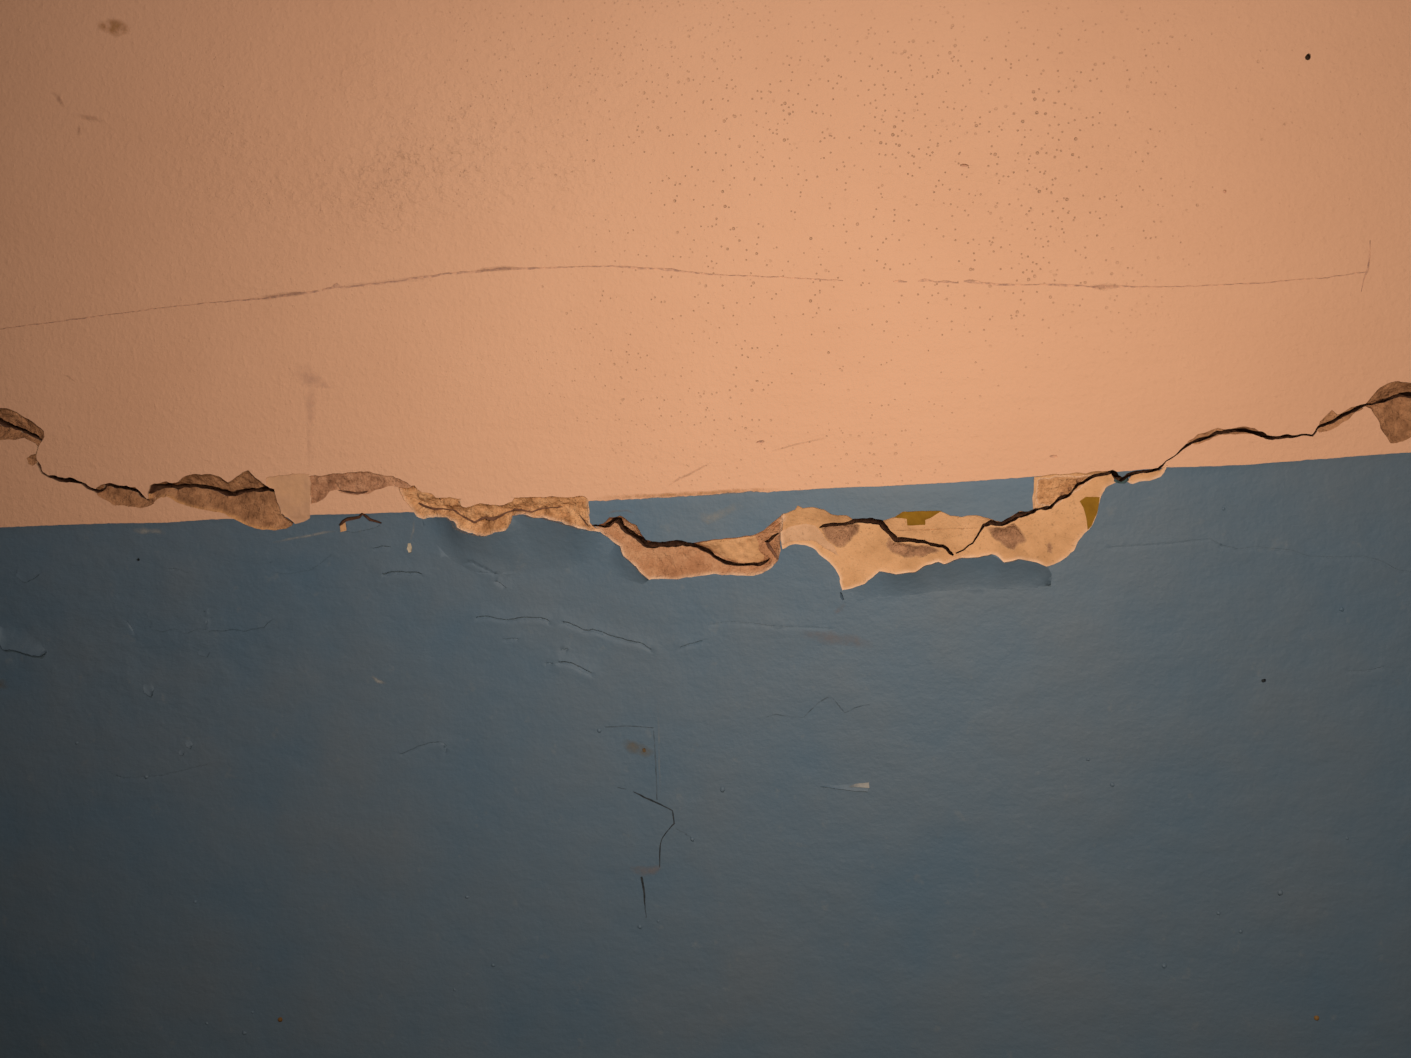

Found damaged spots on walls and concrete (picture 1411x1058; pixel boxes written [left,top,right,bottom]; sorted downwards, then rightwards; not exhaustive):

crack [0,265,843,330]
crack [893,245,1370,291]
spalling [0,408,44,465]
crack [0,418,284,516]
crack [819,392,1411,556]
spalling [1317,381,1411,443]
crack [418,502,779,566]
spalling [97,455,1167,598]
crack [477,616,703,674]
crack [609,726,690,912]